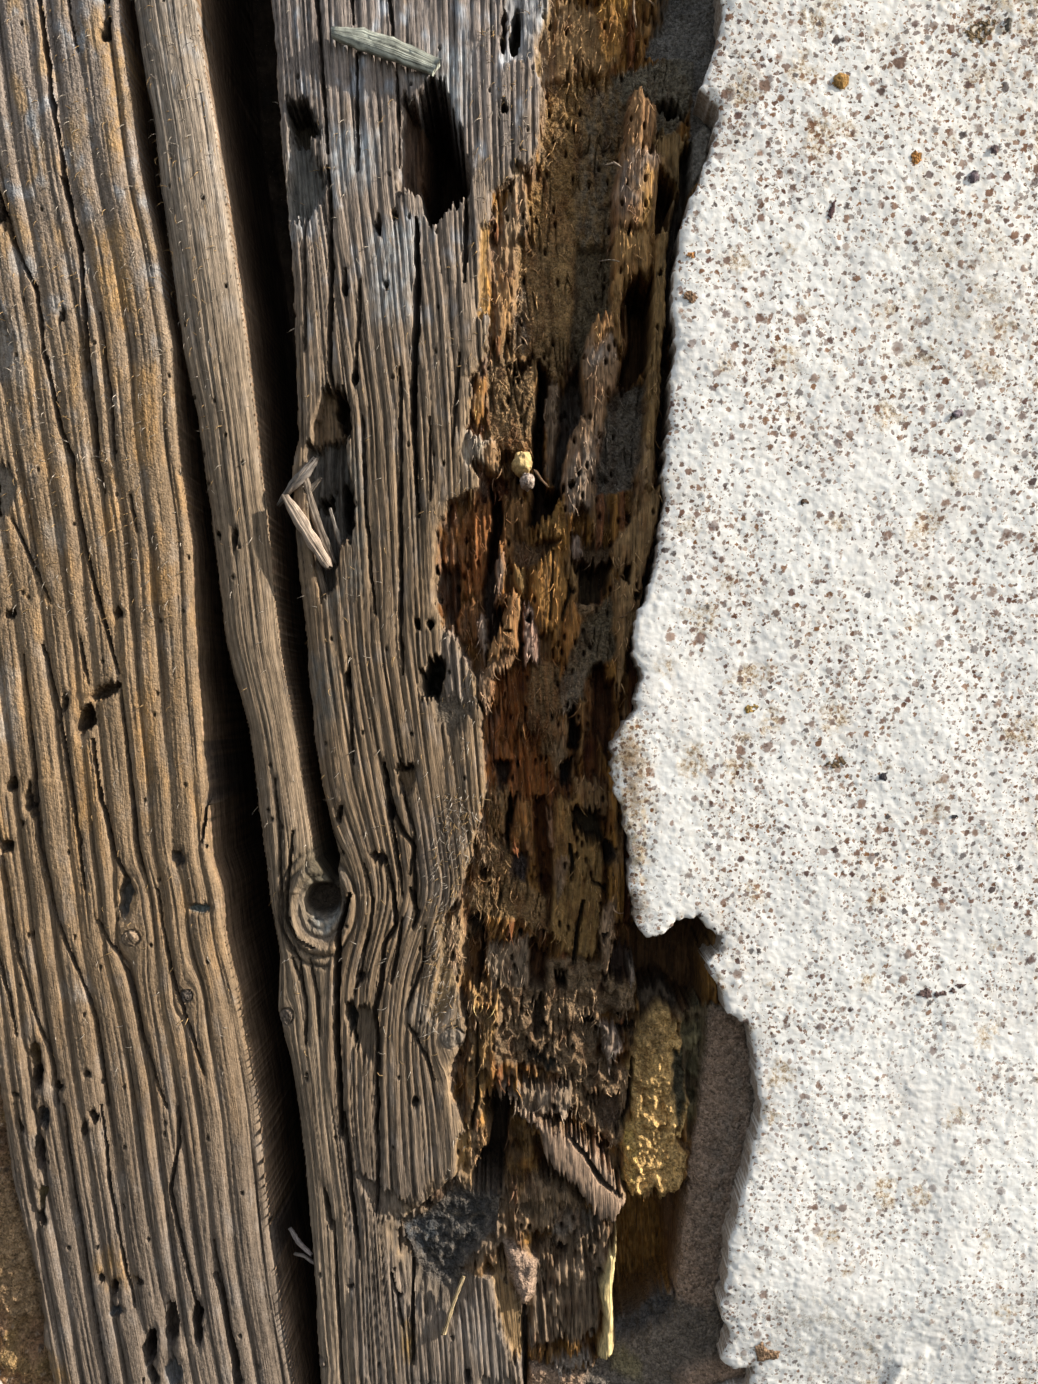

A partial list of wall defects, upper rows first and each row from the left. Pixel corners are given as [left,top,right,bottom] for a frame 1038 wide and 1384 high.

spalling [413,79,471,229]
spalling [644,0,716,204]
spalling [617,275,656,394]
peeling [683,291,698,303]
spalling [529,489,563,530]
spalling [422,655,446,701]
spalling [558,705,582,787]
spalling [572,804,604,847]
spalling [468,910,484,936]
spalling [472,1086,515,1193]
spalling [527,916,780,1384]
spalling [0,1084,55,1384]